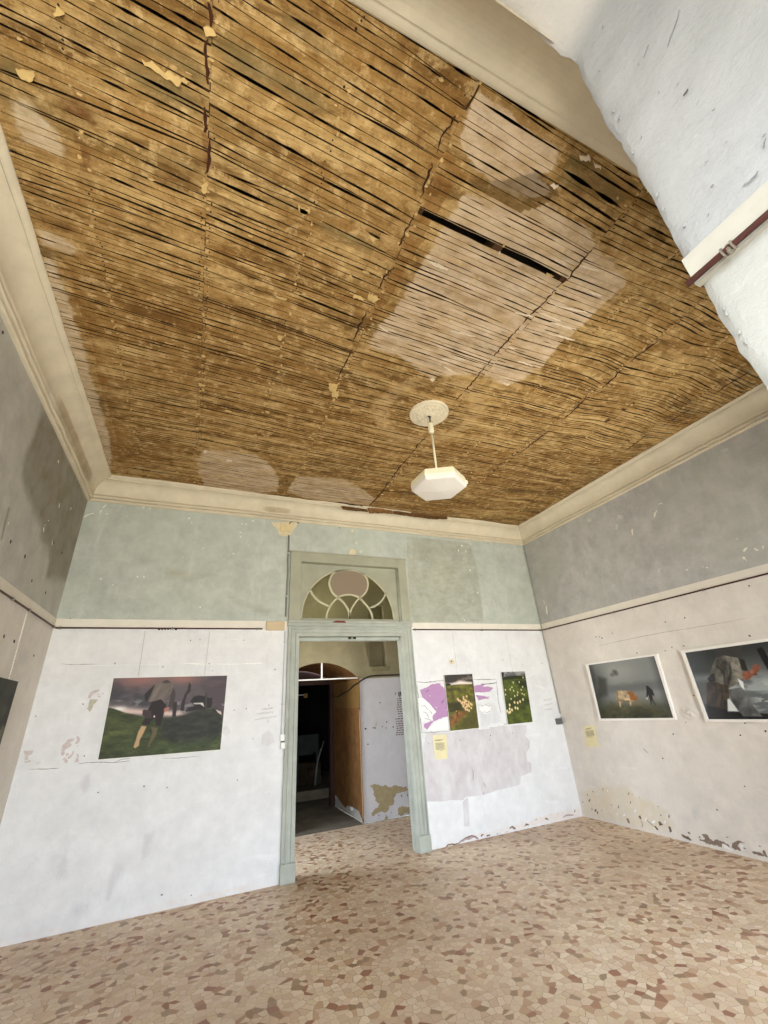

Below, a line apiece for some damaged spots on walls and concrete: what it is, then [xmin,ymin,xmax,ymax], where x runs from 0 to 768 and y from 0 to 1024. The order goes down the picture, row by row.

crack [203,2,214,174]
leakage [528,117,638,219]
leakage [303,87,487,376]
crack [337,313,367,380]
leakage [515,305,588,340]
spalling [335,784,410,823]
spalling [446,818,549,847]
spalling [626,815,767,857]